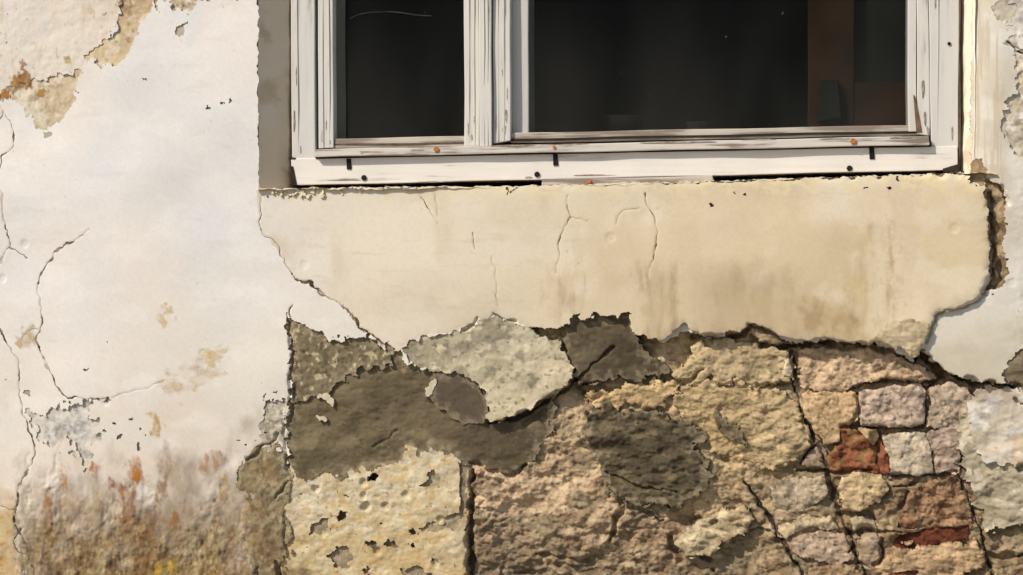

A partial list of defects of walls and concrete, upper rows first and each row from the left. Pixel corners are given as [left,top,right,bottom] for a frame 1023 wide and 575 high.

corrosion [0,62,49,99]
peeling [0,0,210,138]
peeling [991,0,1023,158]
crack [557,195,586,263]
crack [616,192,657,278]
peeling [25,397,123,473]
crack [0,192,162,575]
water stain [0,464,260,575]
flaking render [236,314,1023,575]
crack [743,481,804,575]
crack [790,378,868,575]
crack [955,471,994,575]